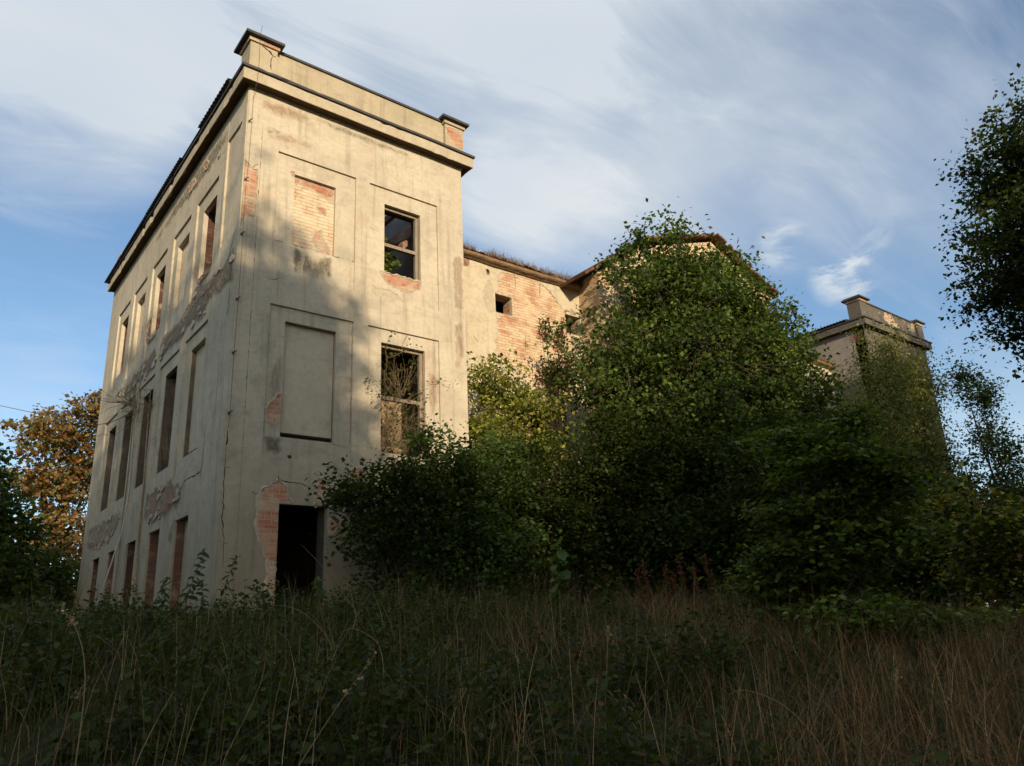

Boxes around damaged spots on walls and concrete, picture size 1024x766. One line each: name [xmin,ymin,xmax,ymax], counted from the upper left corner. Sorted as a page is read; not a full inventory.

peeling [445,126,463,150]
peeling [241,159,259,225]
peeling [290,170,334,217]
peeling [371,270,422,302]
flaking render [116,249,235,397]
crack [183,132,280,562]
peeling [494,271,577,440]
flaking render [145,480,181,524]
peeling [254,478,293,596]